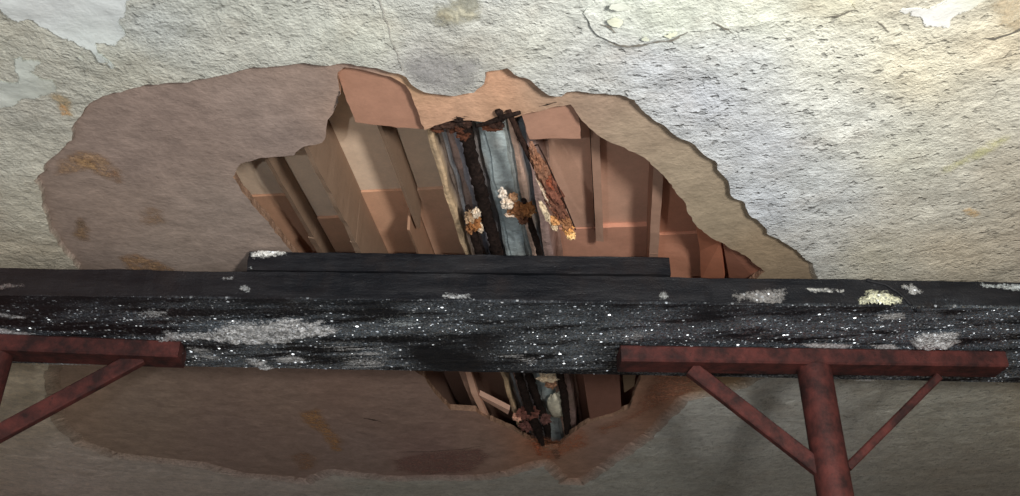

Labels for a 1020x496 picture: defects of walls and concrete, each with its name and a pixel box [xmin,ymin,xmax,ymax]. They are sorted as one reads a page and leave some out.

peeling [0,0,128,69]
peeling [607,3,631,28]
peeling [899,0,985,28]
peeling [0,57,57,108]
corrosion [430,116,505,142]
flaking render [34,63,818,279]
flaking render [43,364,106,398]
flaking render [50,366,711,486]